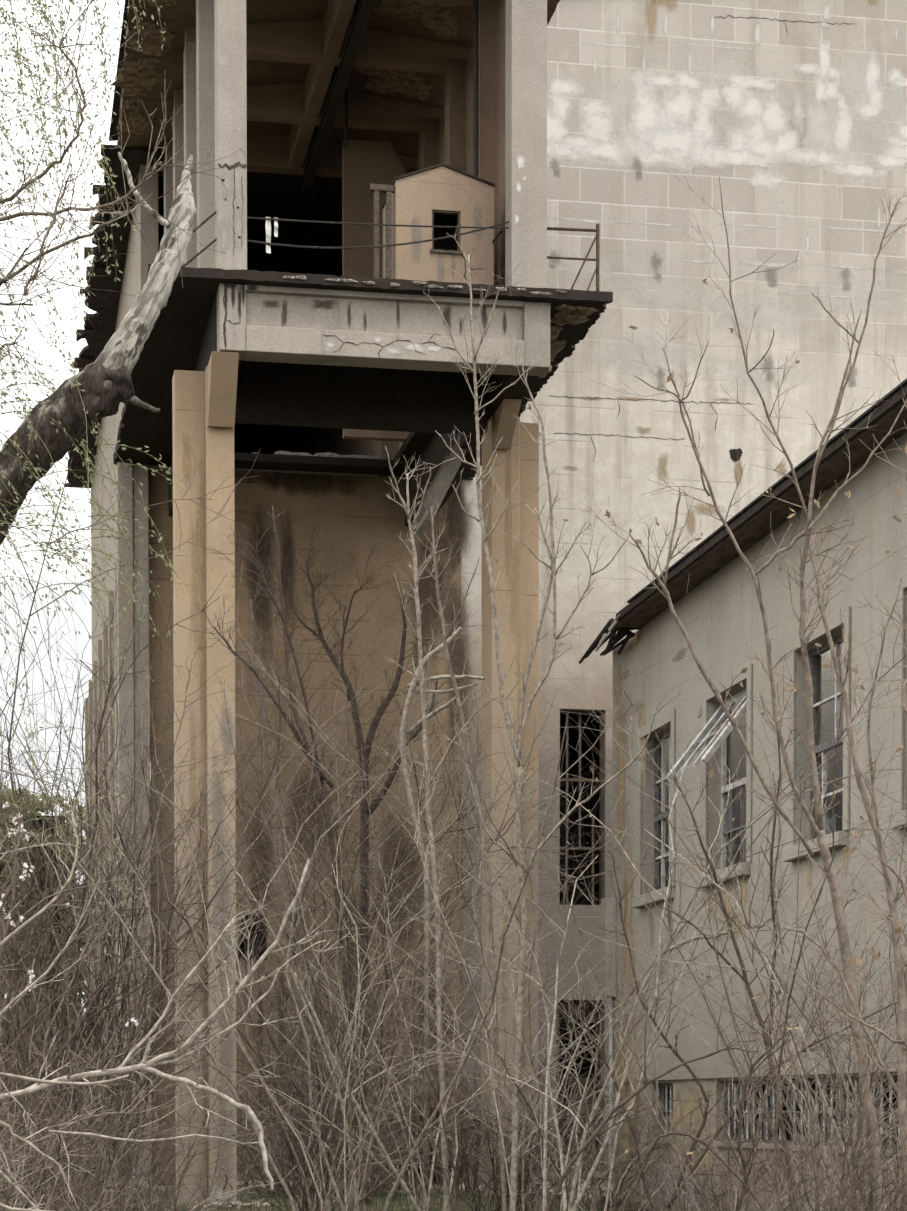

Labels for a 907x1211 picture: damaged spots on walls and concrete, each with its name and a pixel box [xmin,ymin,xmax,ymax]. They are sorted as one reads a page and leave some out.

peeling [112,21,176,96]
water stain [547,12,907,188]
crack [323,334,456,357]